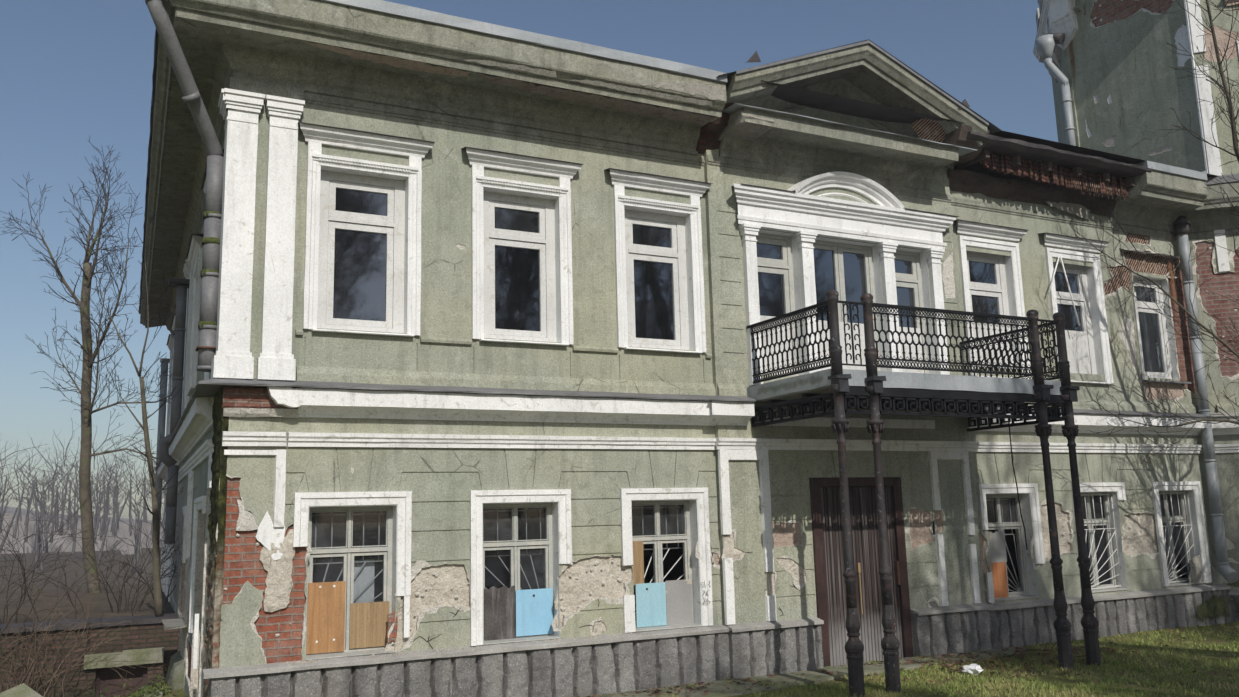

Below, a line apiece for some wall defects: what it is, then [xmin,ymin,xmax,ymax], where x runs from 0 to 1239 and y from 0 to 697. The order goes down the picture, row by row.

spalling [1089,0,1175,28]
peeling [1175,24,1239,67]
spalling [304,41,774,154]
spalling [1104,233,1239,402]
spalling [171,474,312,697]
spalling [384,560,470,654]
spalling [551,555,633,636]
spalling [765,520,808,596]
spalling [905,507,945,552]
spalling [1030,499,1074,570]
spalling [1120,511,1159,559]